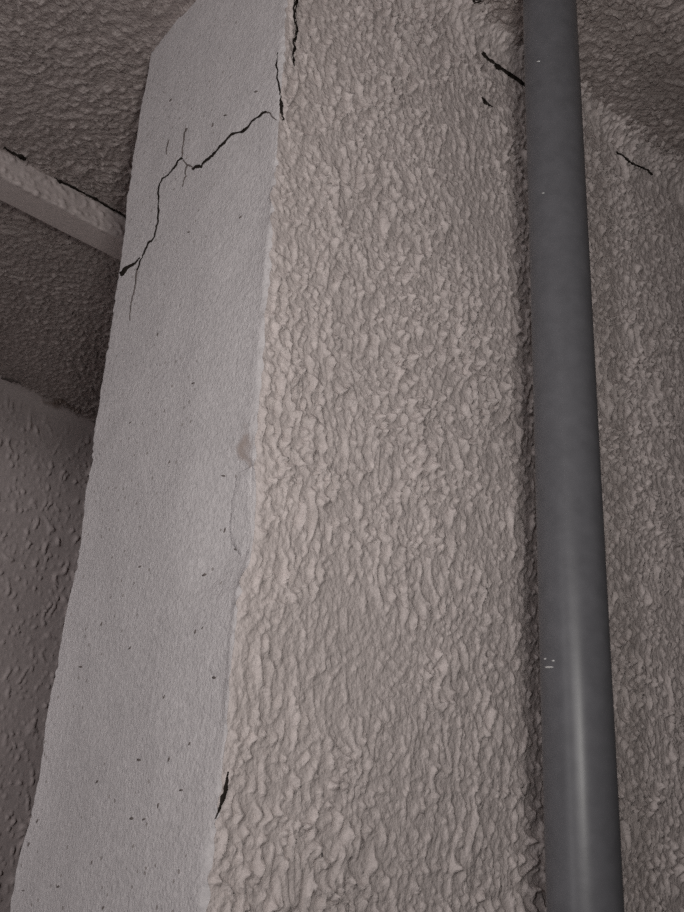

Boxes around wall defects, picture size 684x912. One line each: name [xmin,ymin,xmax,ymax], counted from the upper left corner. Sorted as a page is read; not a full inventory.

crack [481,51,525,87]
crack [119,0,299,320]
crack [616,151,653,175]